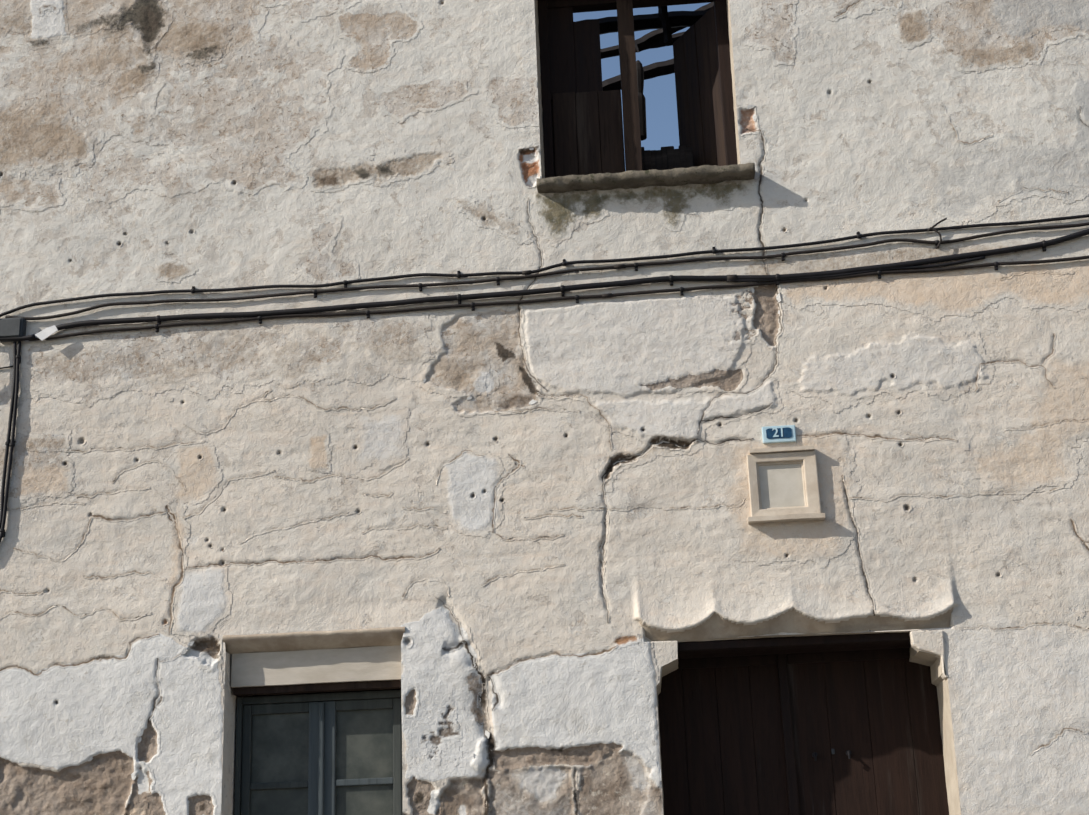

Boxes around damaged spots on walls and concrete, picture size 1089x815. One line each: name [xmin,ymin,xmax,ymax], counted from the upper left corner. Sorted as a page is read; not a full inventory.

peeling [0,0,423,208]
flaking render [515,142,541,188]
leakage [657,186,688,232]
leakage [703,180,741,210]
spalling [415,304,544,417]
spalling [636,281,784,396]
crack [974,333,1089,392]
crack [0,128,784,815]
crack [1004,417,1089,430]
crack [841,475,1089,631]
spalling [0,718,169,815]
flaking render [402,692,663,815]